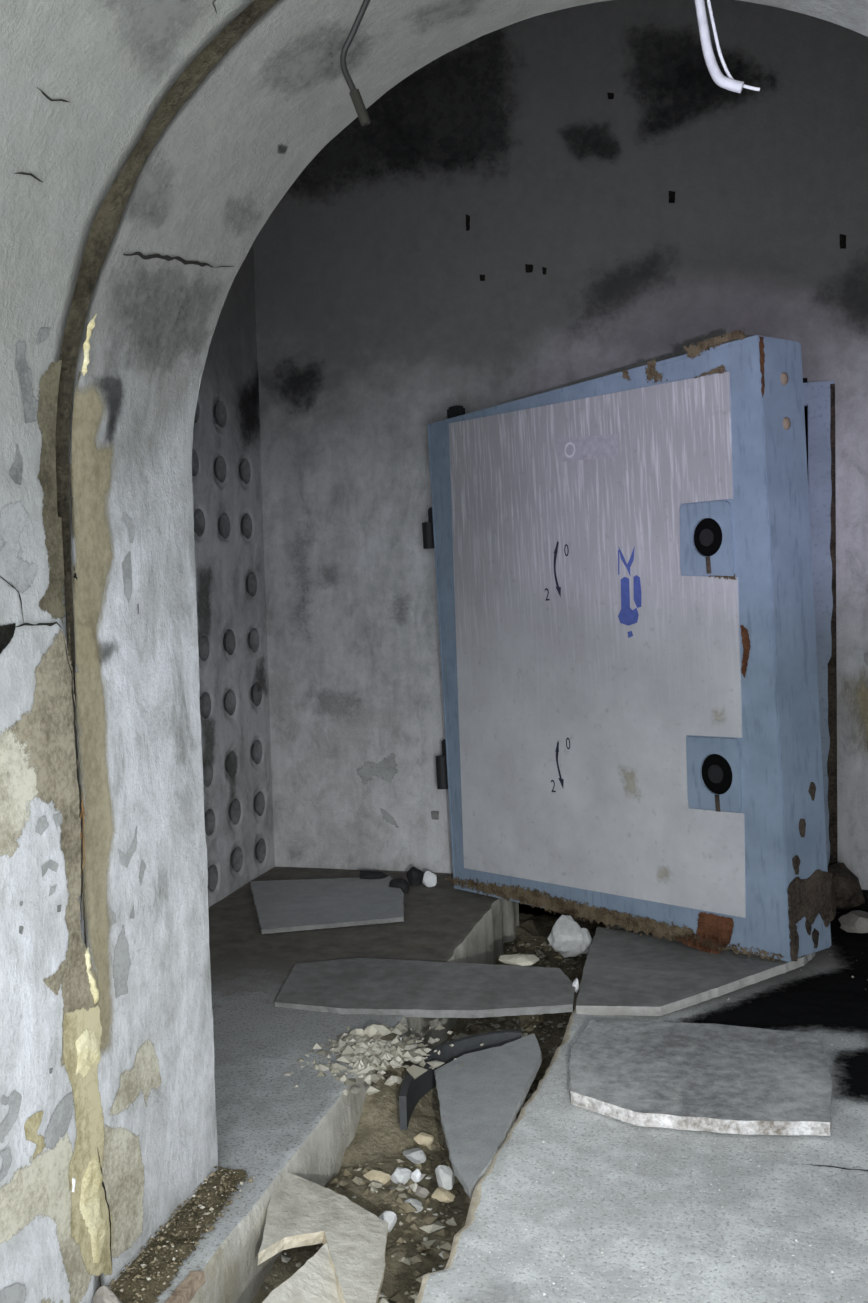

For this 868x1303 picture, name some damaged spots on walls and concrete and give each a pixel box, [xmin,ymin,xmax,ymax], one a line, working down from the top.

crack [123,252,234,268]
corrosion [621,357,667,383]
corrosion [683,330,765,398]
crack [63,637,83,936]
peeling [36,813,63,835]
peeling [42,860,61,912]
peeling [43,960,68,995]
peeling [109,1039,162,1116]
peeling [0,1090,92,1303]
crack [97,1147,112,1267]